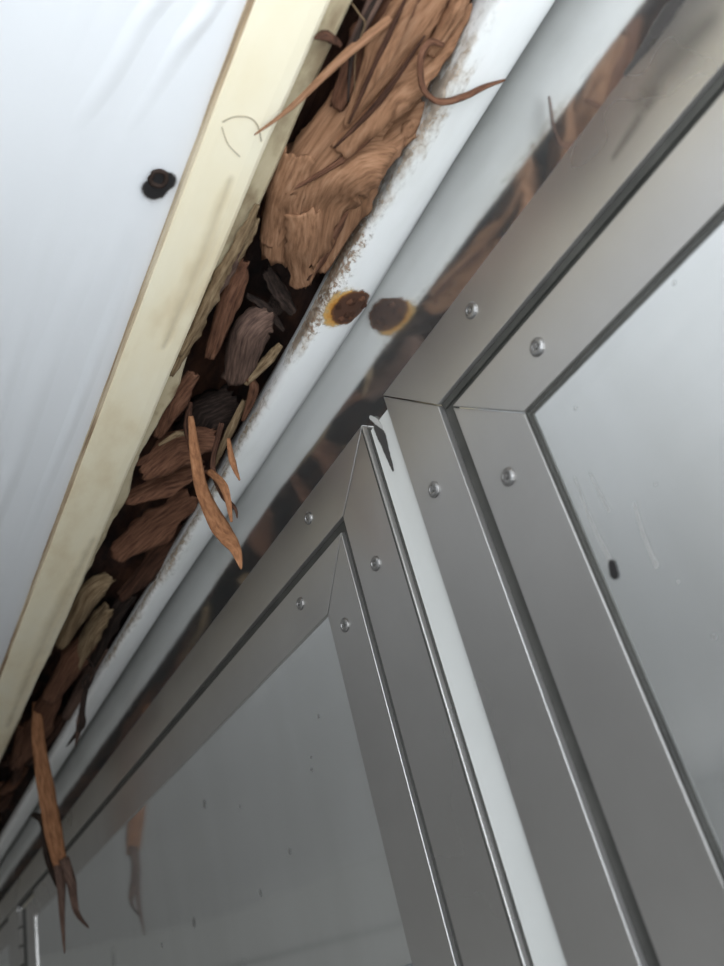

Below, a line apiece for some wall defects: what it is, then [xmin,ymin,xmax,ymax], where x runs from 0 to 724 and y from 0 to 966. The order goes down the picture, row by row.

corrosion [417,54,458,140]
corrosion [292,147,412,351]
peeling [9,0,473,769]